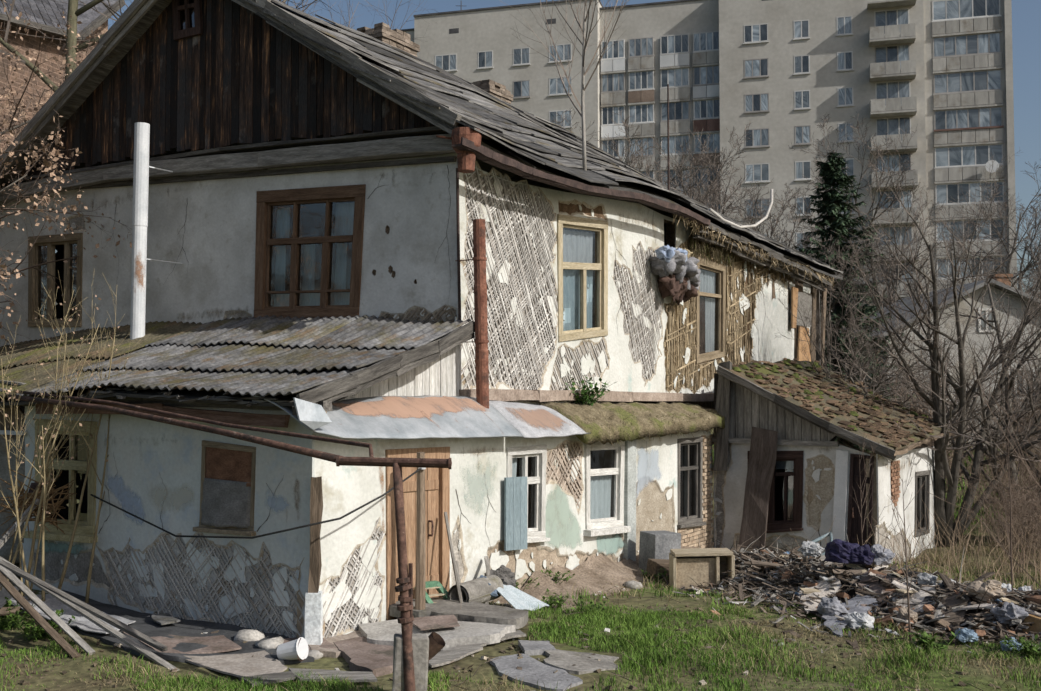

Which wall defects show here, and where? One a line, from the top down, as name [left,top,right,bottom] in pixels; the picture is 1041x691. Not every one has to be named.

flaking render [379,161,610,390]
flaking render [612,233,796,394]
rust [332,396,486,421]
rust [512,409,566,430]
flaking render [487,434,835,590]
flaking render [32,532,305,638]
flaking render [319,517,386,638]